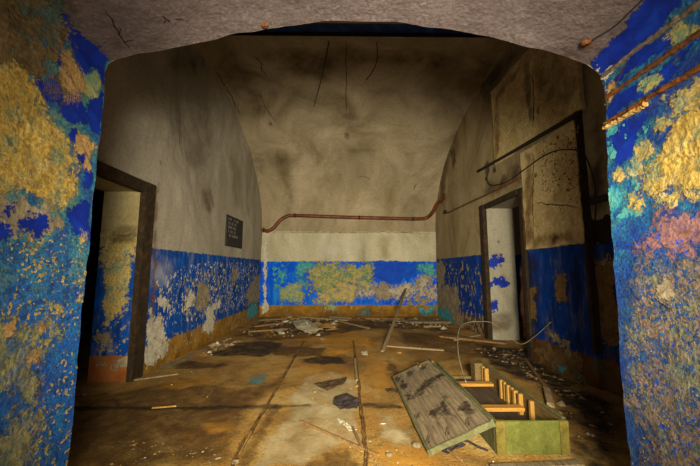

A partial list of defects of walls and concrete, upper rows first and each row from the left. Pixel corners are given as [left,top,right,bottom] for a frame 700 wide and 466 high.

crack [106,11,132,48]
peeling [0,0,108,466]
peeling [93,229,137,372]
peeling [144,232,510,370]
peeling [529,285,538,321]
peeling [552,270,568,304]
peeling [545,324,583,382]
peeling [590,0,700,466]